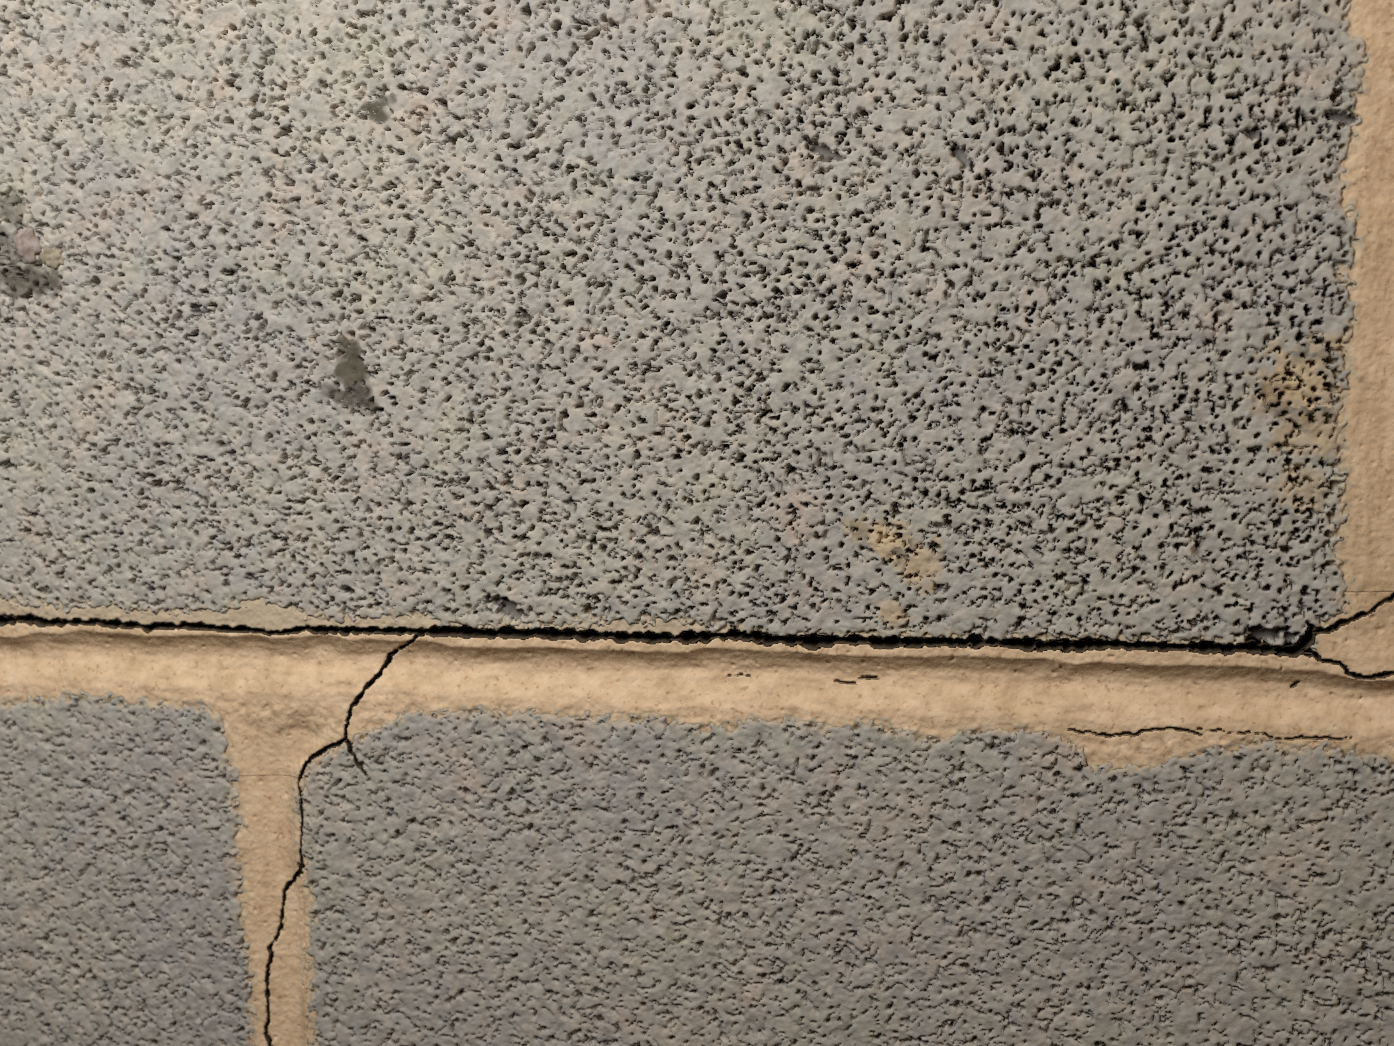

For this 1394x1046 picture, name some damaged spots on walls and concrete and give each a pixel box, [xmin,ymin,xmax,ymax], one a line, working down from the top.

crack [0,592,1394,1046]